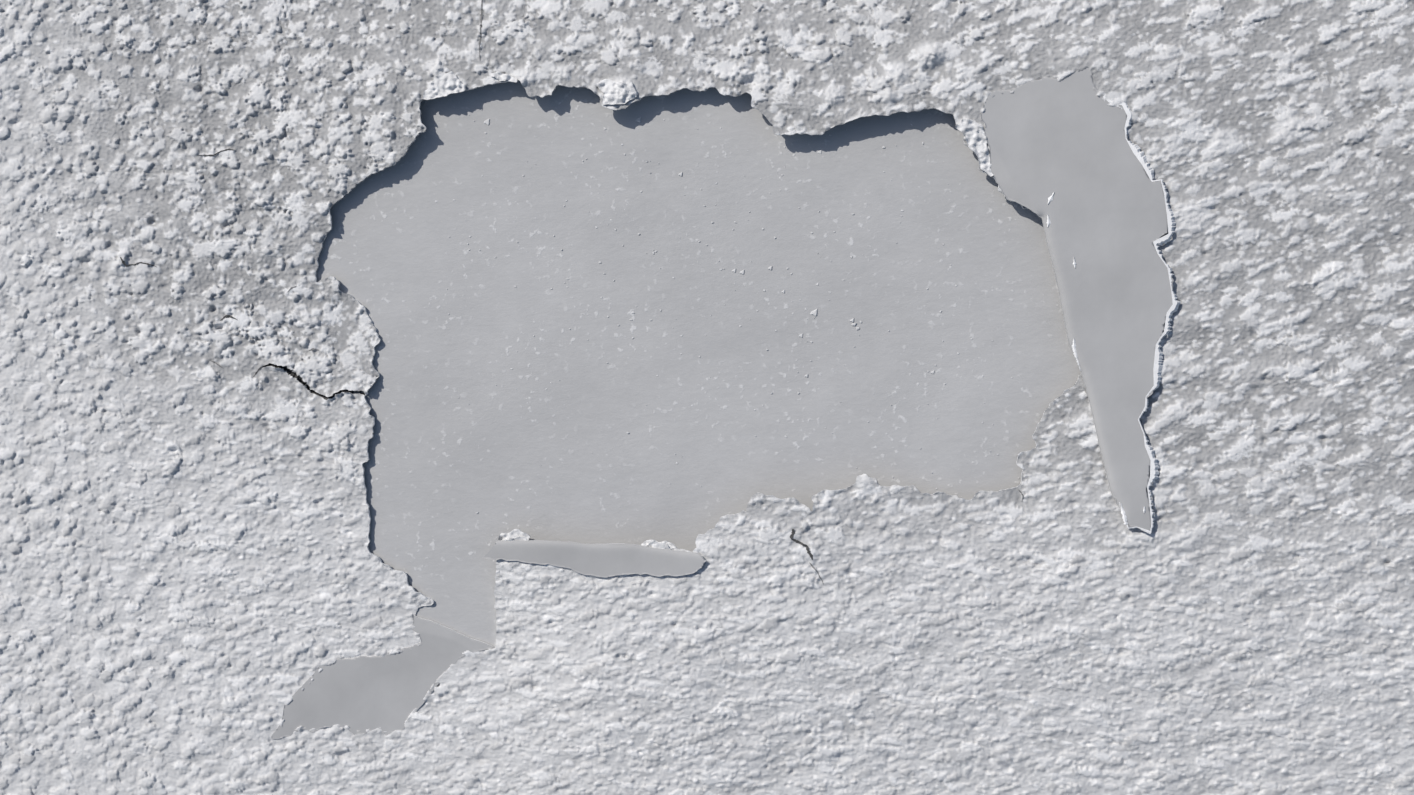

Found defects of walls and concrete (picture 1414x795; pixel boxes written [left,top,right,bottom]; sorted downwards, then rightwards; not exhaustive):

crack [210,348,365,400]
peeling [261,68,1181,739]